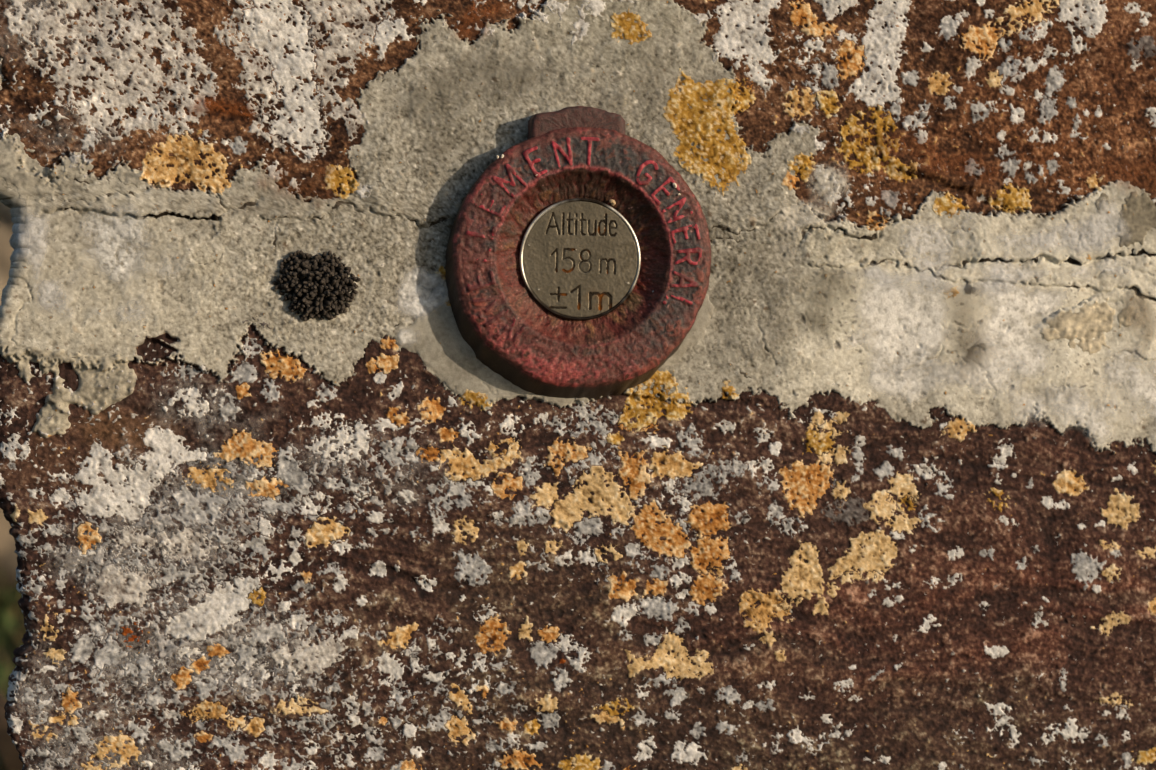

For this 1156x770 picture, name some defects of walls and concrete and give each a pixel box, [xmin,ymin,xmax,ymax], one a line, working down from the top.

crack [59,177,355,251]
crack [387,214,448,227]
crack [710,212,780,243]
crack [800,221,1156,316]